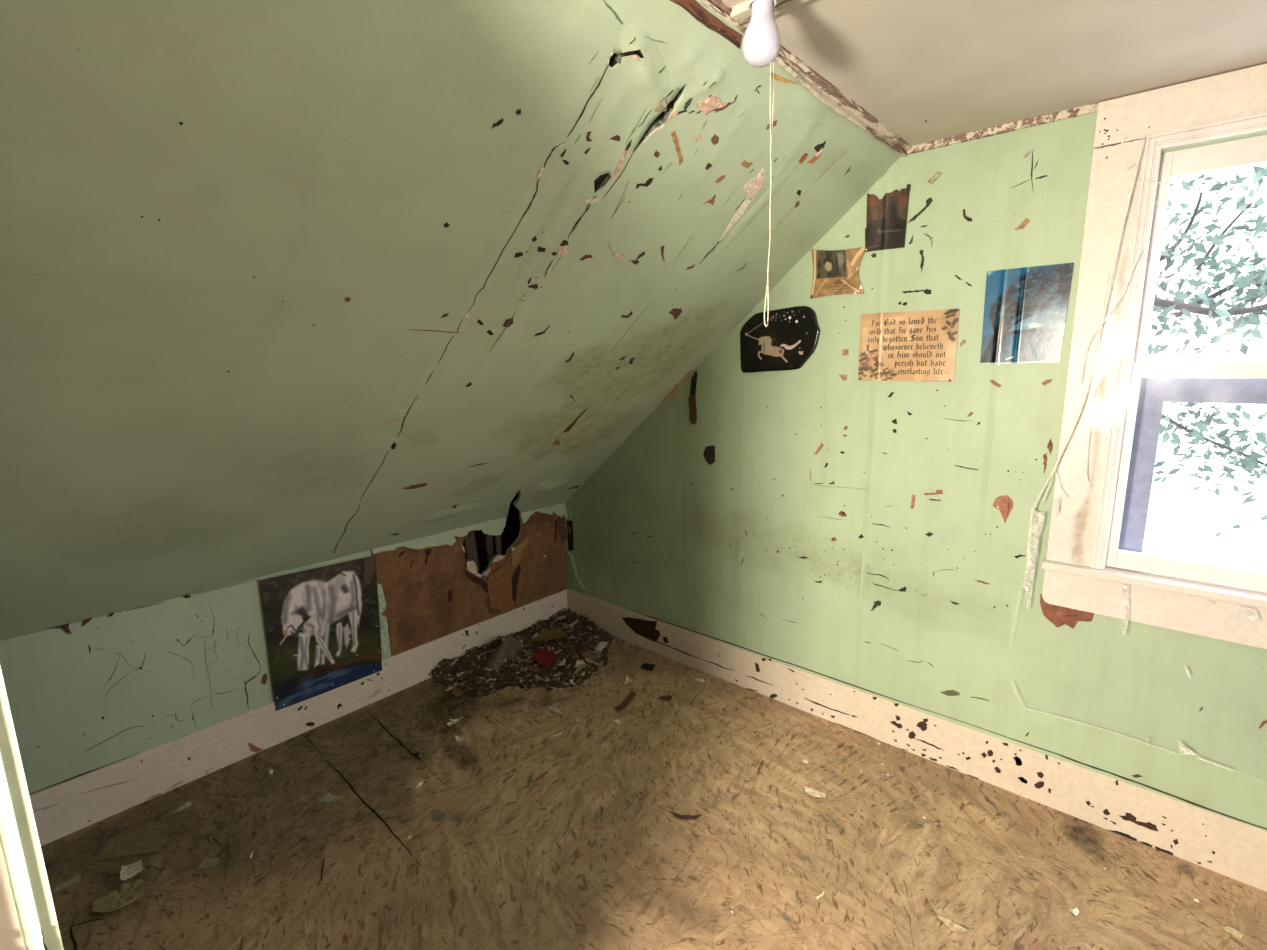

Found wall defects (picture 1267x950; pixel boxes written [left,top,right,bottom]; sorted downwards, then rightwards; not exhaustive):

peeling [636,150,662,189]
peeling [703,163,725,205]
crack [490,110,652,351]
crack [332,66,608,554]
peeling [477,318,513,335]
peeling [993,495,1013,523]
peeling [361,491,567,700]
peeling [1040,594,1094,628]
crack [81,603,267,754]
spalling [890,703,942,761]
spalling [958,741,1060,793]
spalling [1086,801,1179,845]